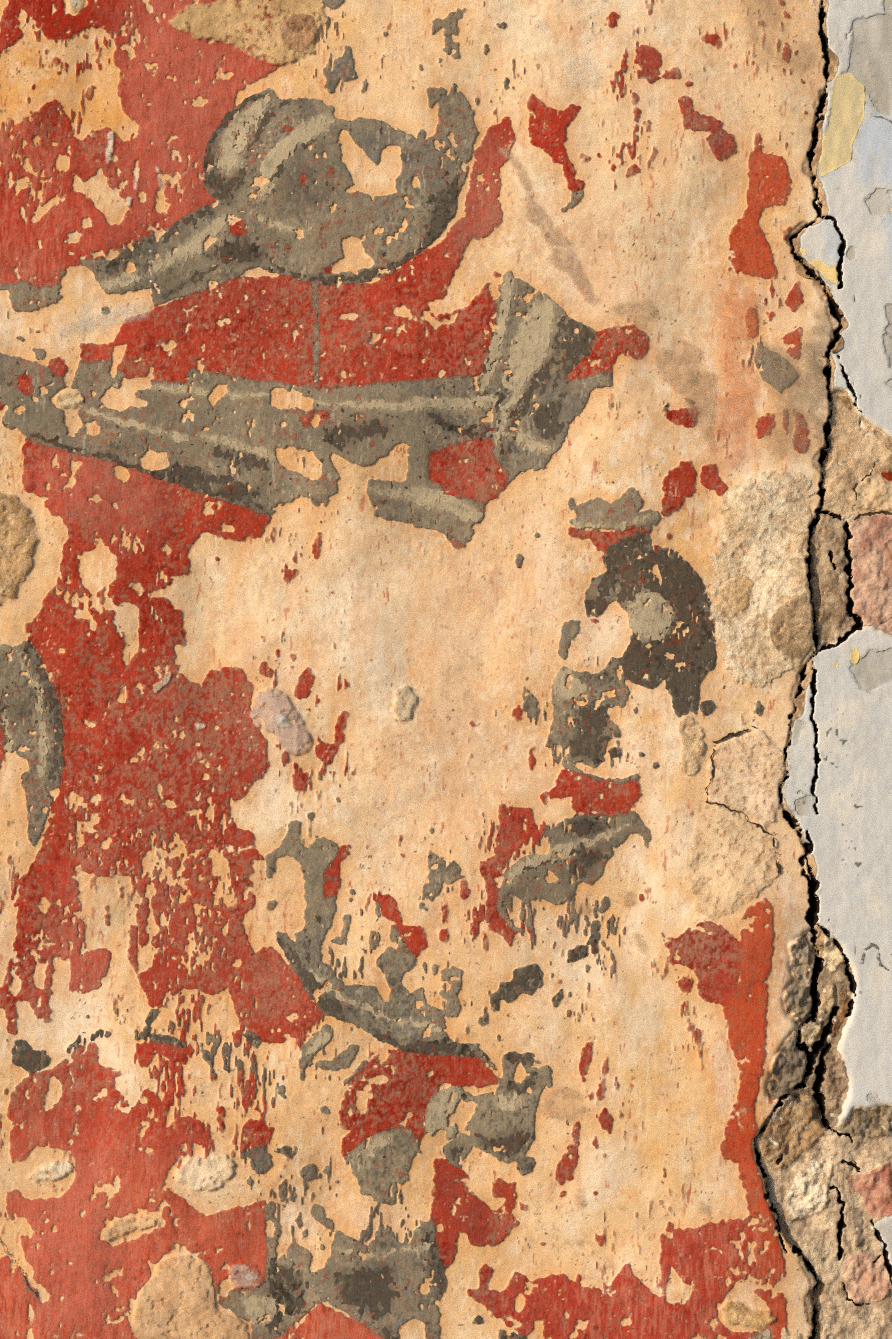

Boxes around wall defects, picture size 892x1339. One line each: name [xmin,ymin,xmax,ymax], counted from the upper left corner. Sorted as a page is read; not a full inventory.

peeling [0,0,285,288]
peeling [48,28,803,408]
peeling [17,372,33,395]
peeling [290,409,330,440]
peeling [427,437,509,504]
peeling [460,0,892,1339]
crack [705,0,892,1339]
peeling [0,438,354,1339]
peeling [362,891,448,966]
peeling [321,1048,500,1160]
peeling [430,1158,527,1268]
peeling [273,1303,384,1339]